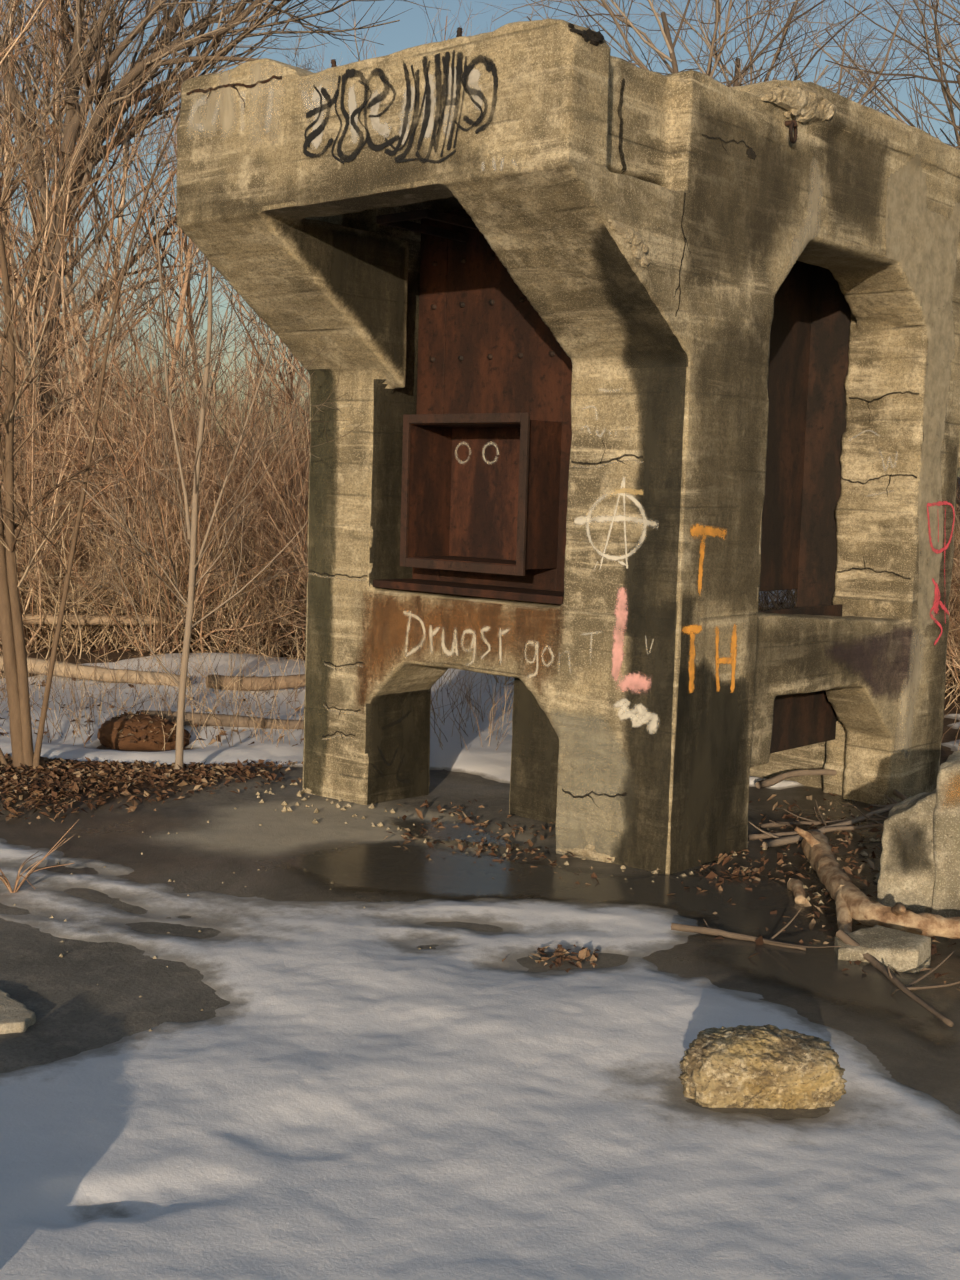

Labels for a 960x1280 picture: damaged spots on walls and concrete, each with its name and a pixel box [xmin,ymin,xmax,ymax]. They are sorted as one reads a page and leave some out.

crack [186,75,282,108]
crack [618,78,626,174]
water stain [689,115,794,276]
water stain [792,120,887,261]
crack [571,440,643,465]
crack [849,391,919,423]
water stain [592,226,958,875]
crack [562,789,627,808]